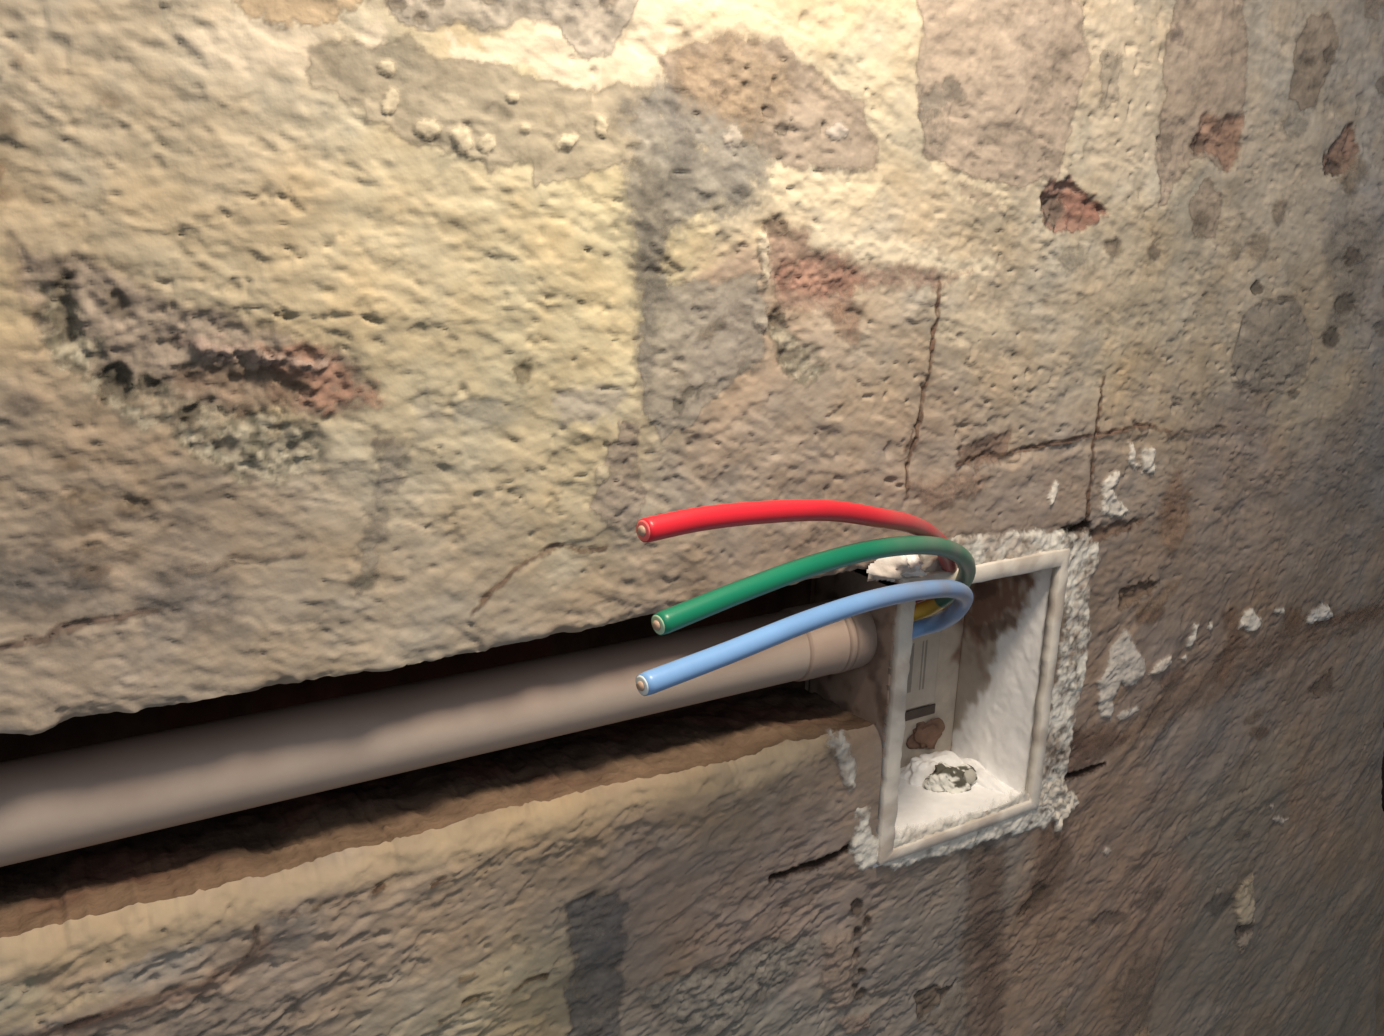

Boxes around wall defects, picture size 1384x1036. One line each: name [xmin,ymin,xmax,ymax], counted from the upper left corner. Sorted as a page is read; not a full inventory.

peeling [235,0,363,27]
peeling [306,0,653,187]
peeling [660,31,879,173]
peeling [916,0,1122,233]
peeling [1155,0,1248,238]
leakage [620,80,768,411]
crack [905,280,941,495]
crack [956,376,1245,533]
peeling [1231,280,1313,397]
crack [0,609,158,649]
peeling [86,984,298,1036]
leakage [564,892,629,1036]